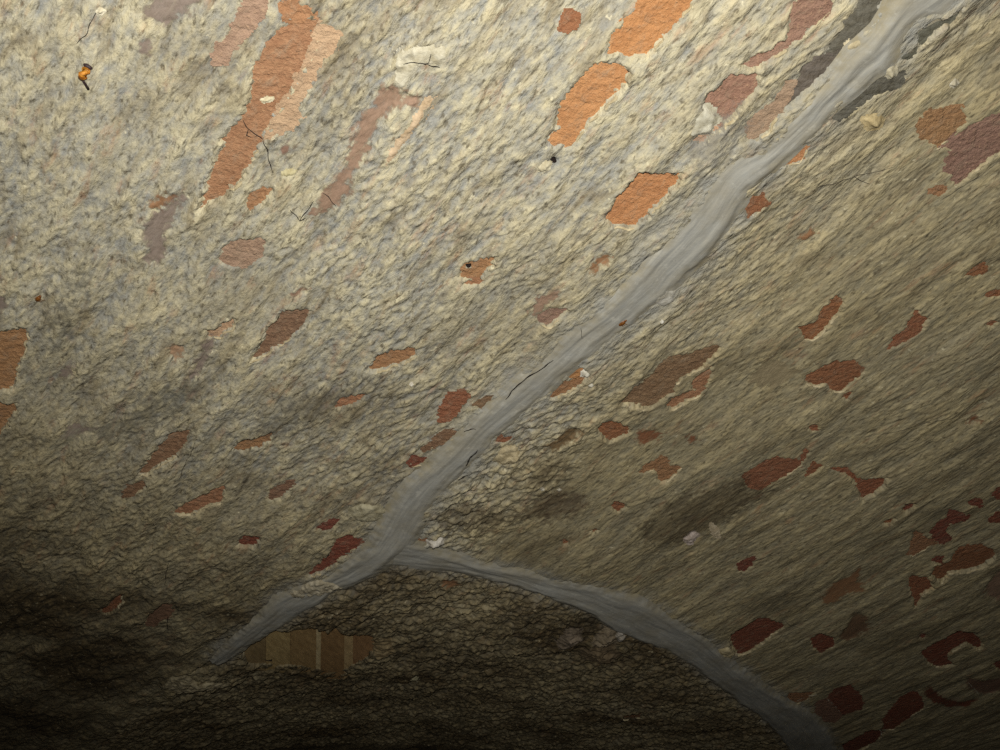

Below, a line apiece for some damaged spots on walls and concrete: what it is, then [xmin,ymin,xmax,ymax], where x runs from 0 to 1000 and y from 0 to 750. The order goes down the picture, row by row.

flaking render [547,0,692,148]
flaking render [691,0,833,143]
flaking render [200,0,344,211]
flaking render [915,104,1000,196]
flaking render [606,172,680,232]
flaking render [0,328,30,389]
flaking render [250,309,309,364]
crack [506,360,553,399]
flaking render [622,345,720,412]
flaking render [805,359,865,399]
flaking render [742,448,886,497]
flaking render [718,618,784,658]